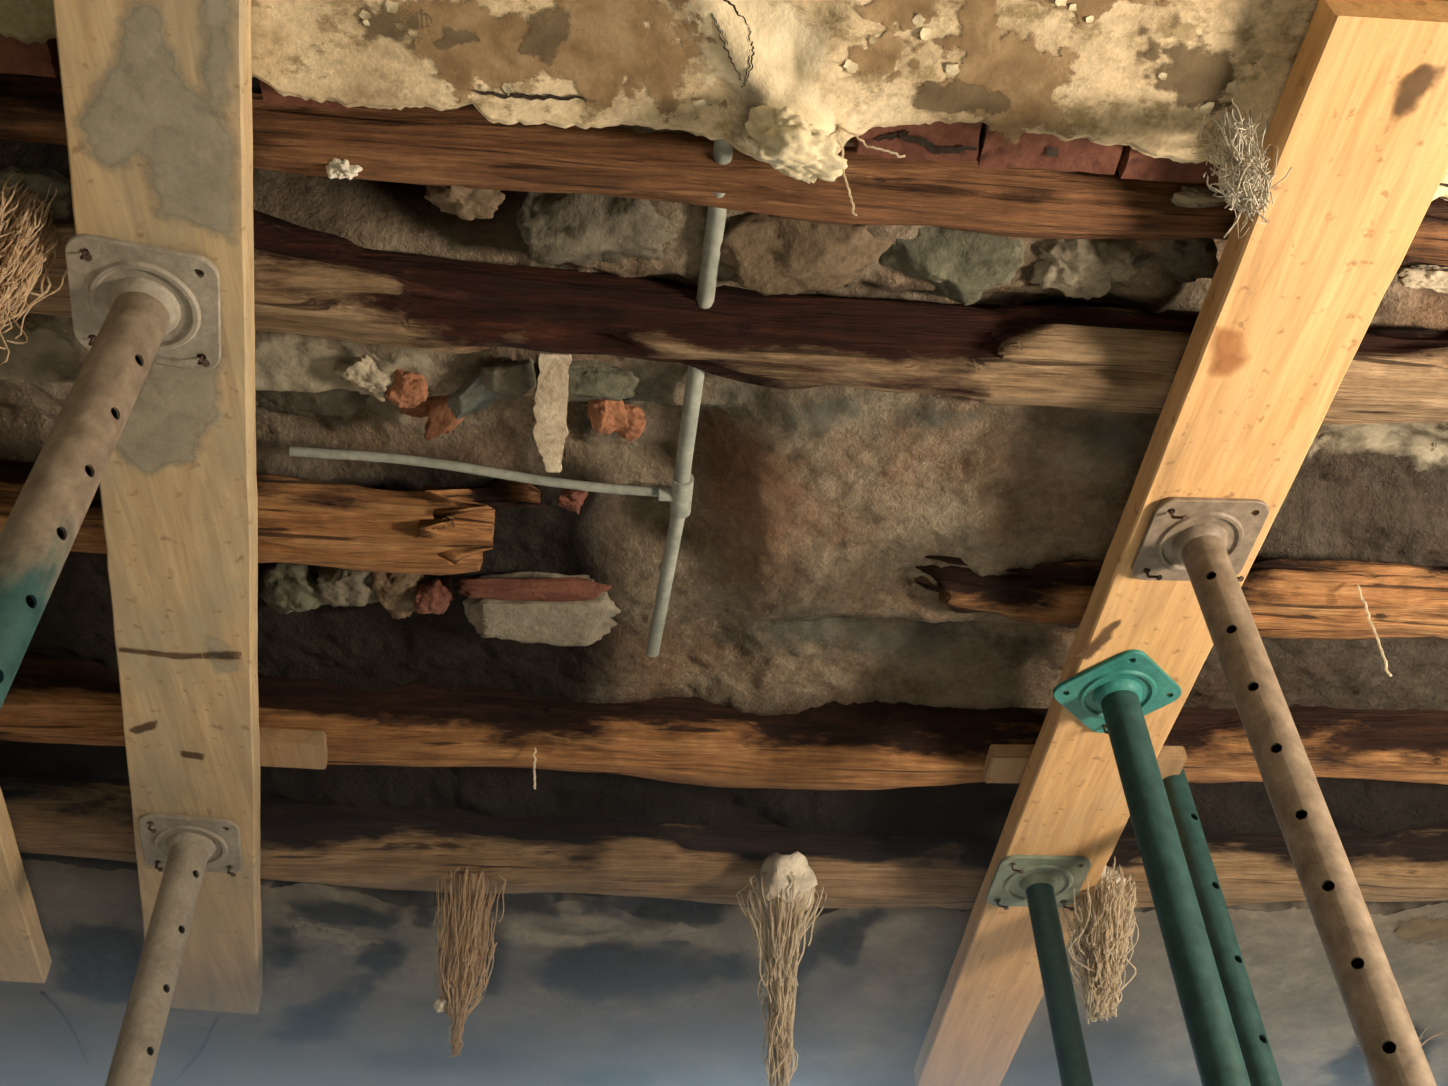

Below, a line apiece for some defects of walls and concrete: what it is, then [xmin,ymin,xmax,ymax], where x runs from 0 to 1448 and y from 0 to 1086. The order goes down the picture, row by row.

crack [711,0,755,88]
crack [467,87,597,102]